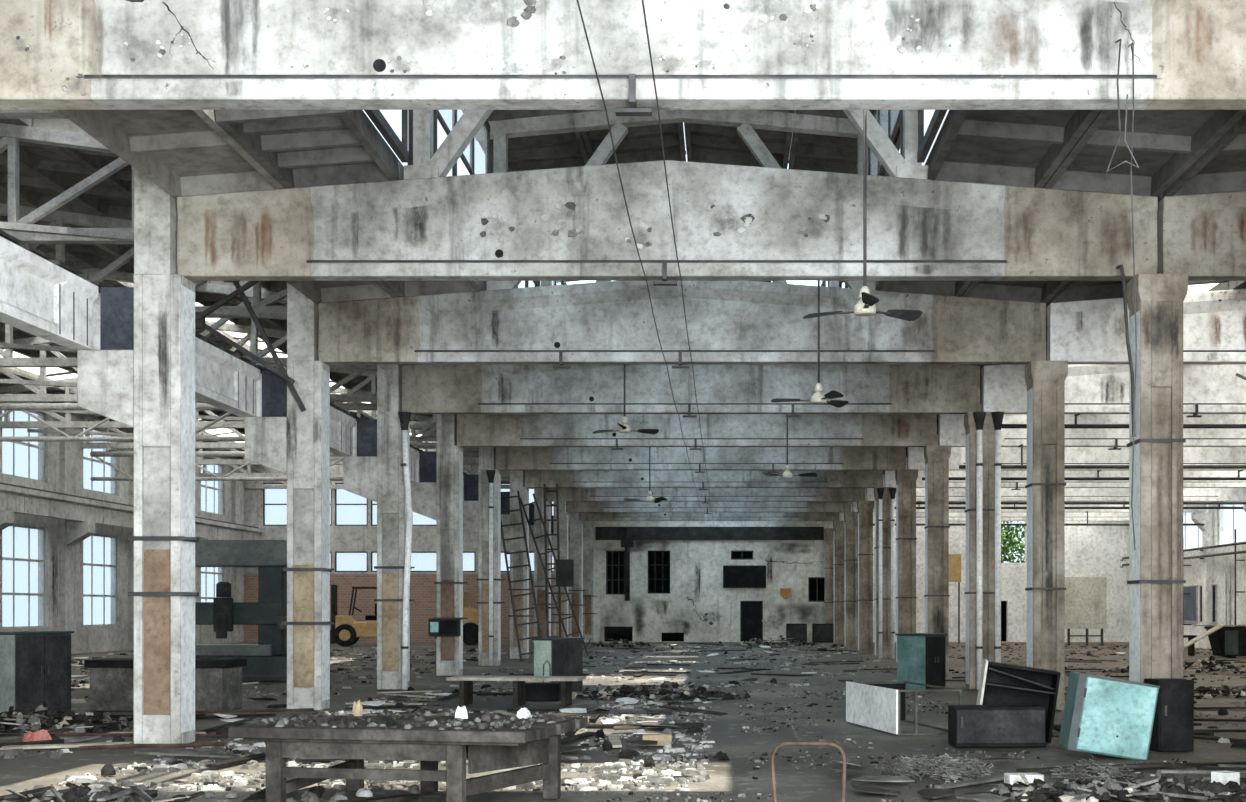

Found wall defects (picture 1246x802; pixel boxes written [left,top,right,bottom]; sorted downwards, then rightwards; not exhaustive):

crack [163,2,215,65]
peeling [507,0,537,27]
water stain [1081,4,1112,59]
water stain [922,208,949,255]